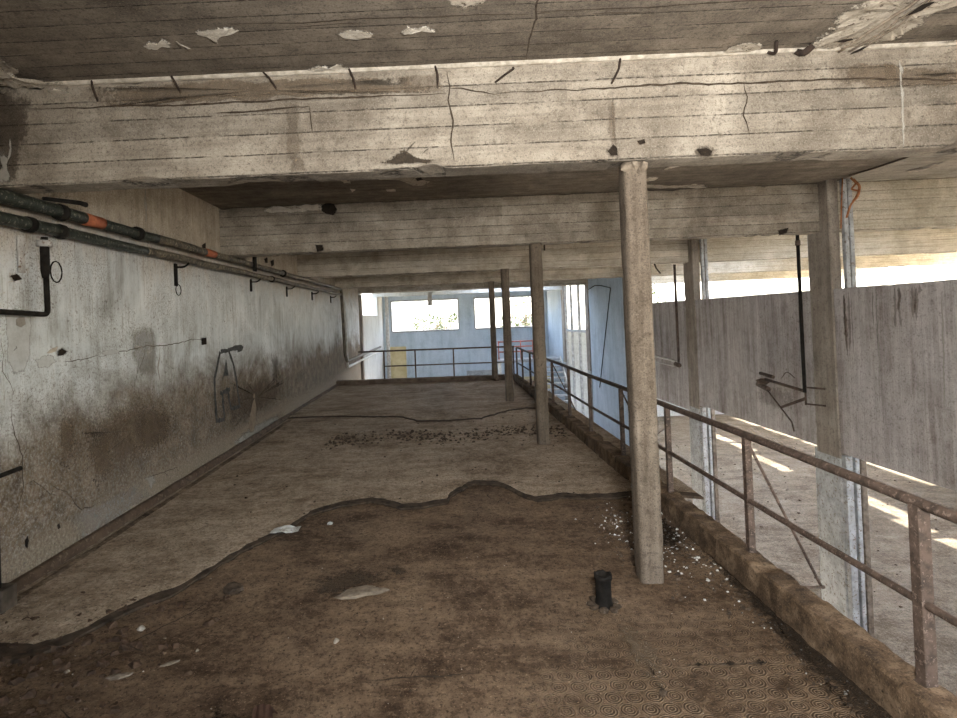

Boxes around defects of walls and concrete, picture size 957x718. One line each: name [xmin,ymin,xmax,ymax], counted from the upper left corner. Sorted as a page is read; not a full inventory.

spalling [448,0,486,10]
peeling [144,40,190,50]
peeling [195,27,239,43]
peeling [339,29,373,40]
spalling [793,0,957,57]
spalling [0,59,69,94]
spalling [647,166,707,189]
water stain [220,354,288,444]
water stain [60,394,180,482]